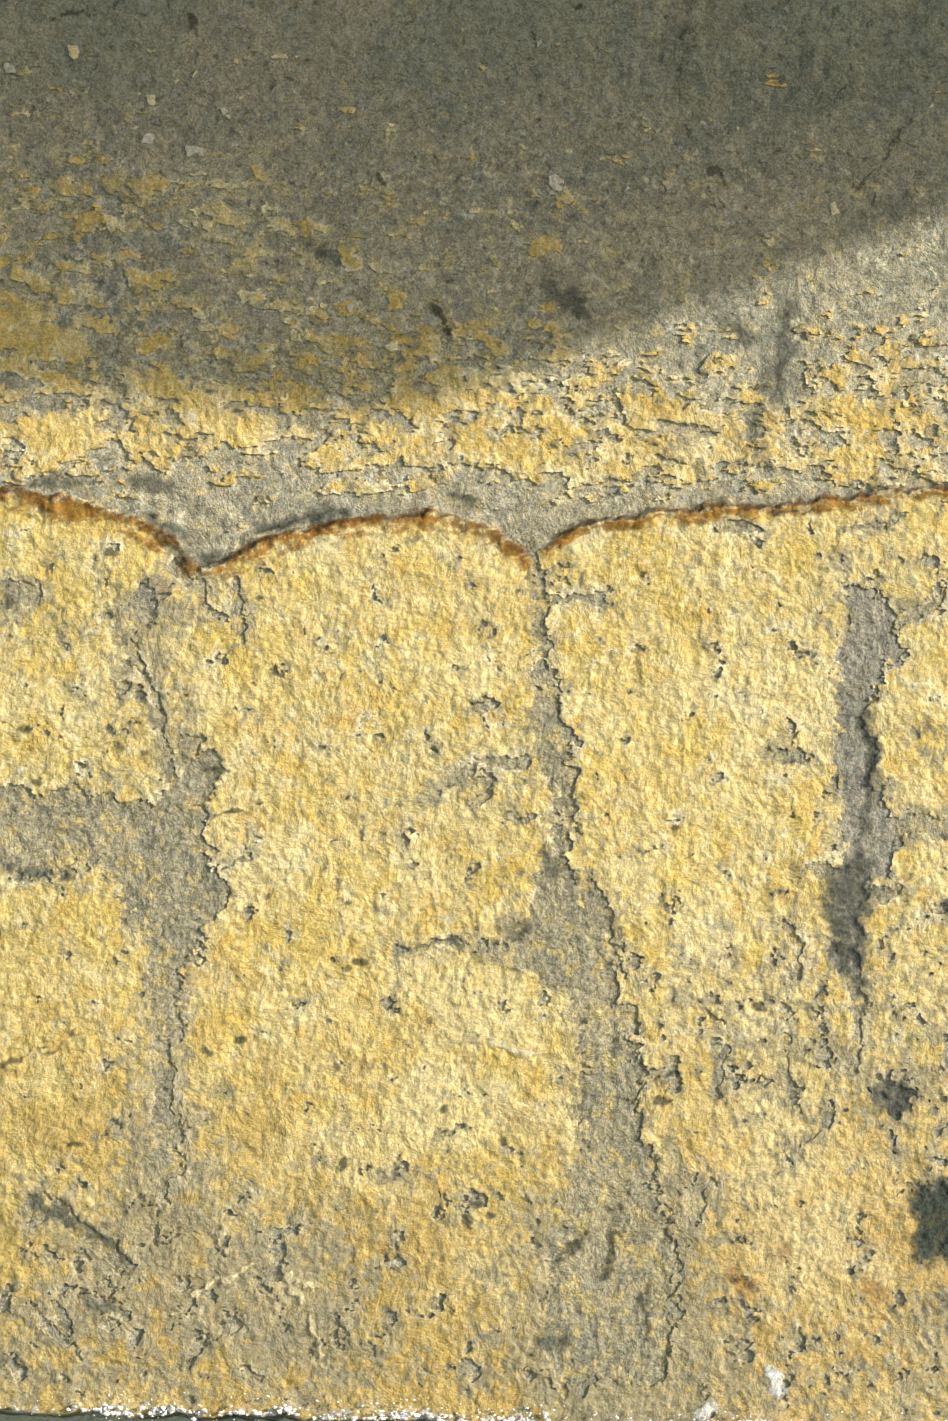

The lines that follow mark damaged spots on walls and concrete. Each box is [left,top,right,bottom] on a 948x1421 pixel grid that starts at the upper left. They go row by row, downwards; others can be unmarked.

peeling [763,74,787,87]
peeling [119,93,164,154]
peeling [0,143,948,506]
crack [204,509,351,567]
crack [448,481,477,508]
crack [548,481,946,551]
leakage [820,707,884,988]
mould [910,1177,948,1268]